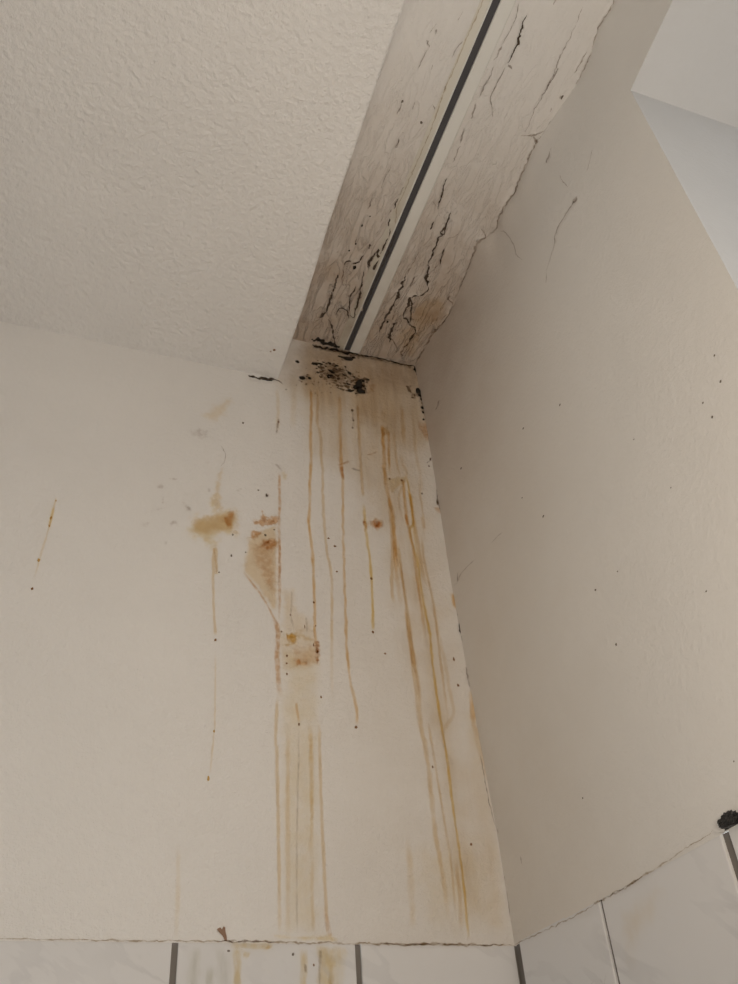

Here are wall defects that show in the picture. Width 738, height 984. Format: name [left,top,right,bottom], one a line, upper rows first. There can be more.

leakage [285,337,417,396]